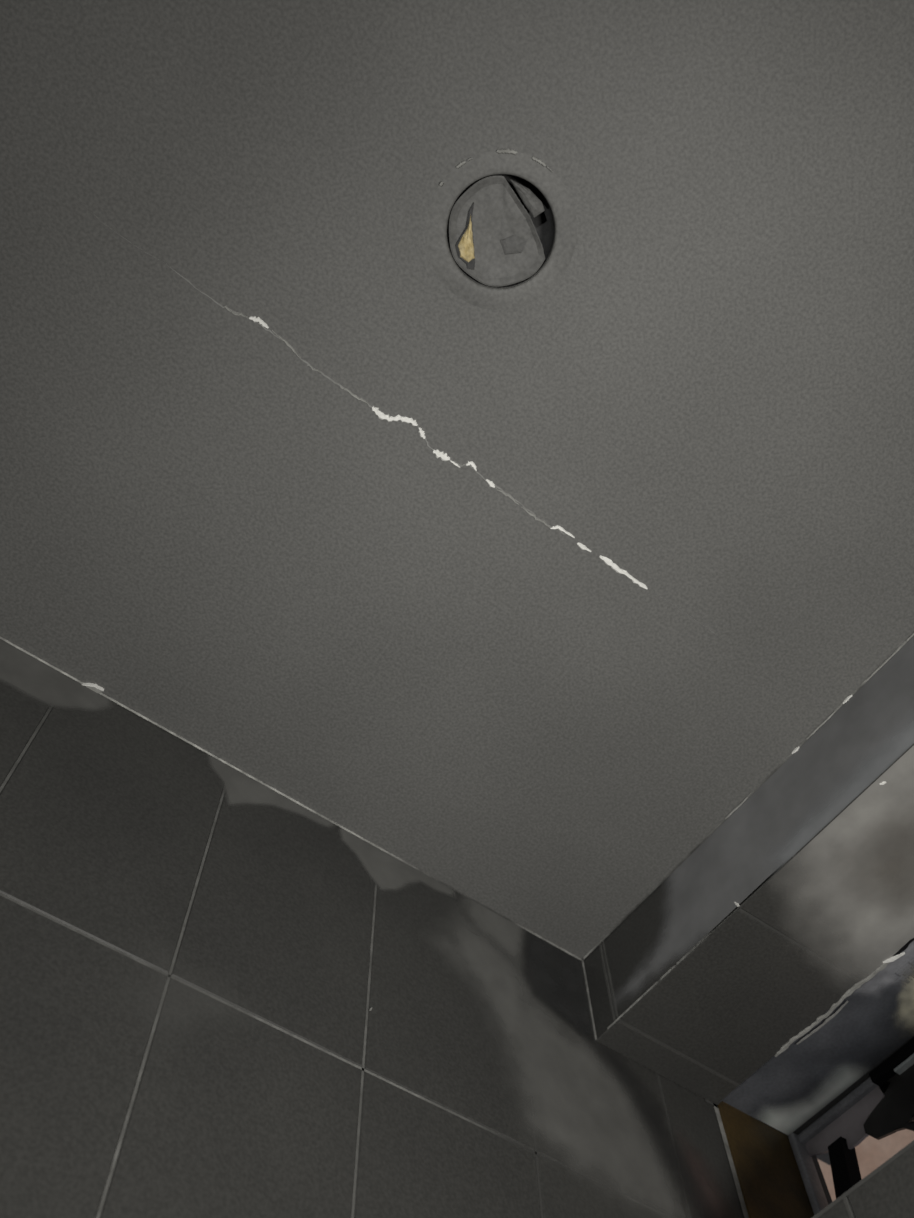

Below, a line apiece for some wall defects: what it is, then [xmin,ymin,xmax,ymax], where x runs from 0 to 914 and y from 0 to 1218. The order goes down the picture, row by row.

crack [78,199,729,644]